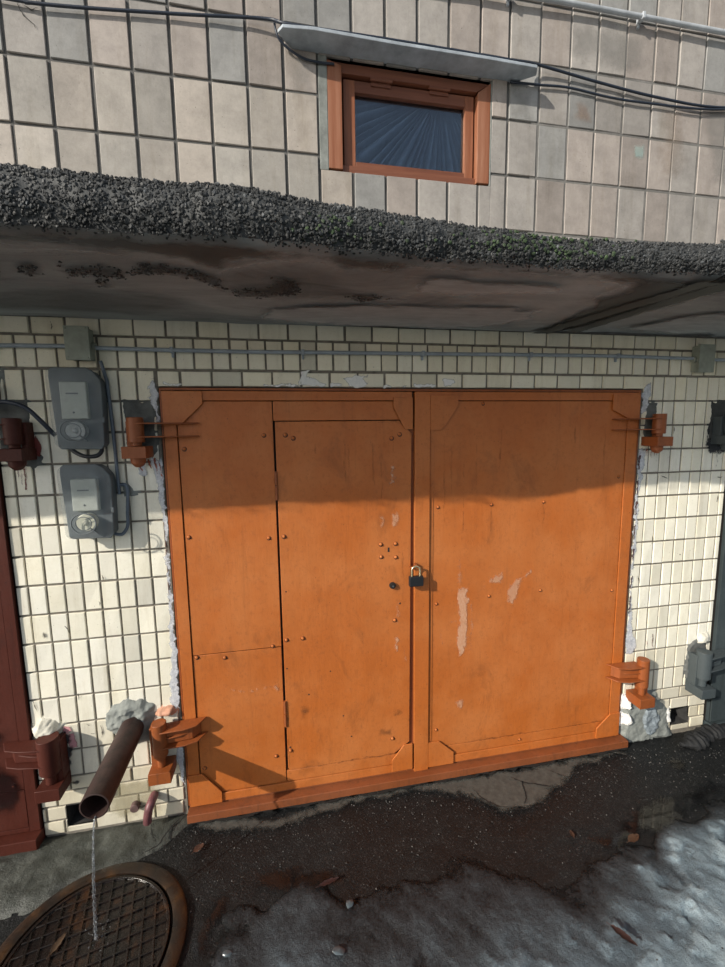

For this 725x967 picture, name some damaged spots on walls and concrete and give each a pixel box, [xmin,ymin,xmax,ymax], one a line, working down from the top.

water stain [0,235,277,274]
water stain [535,278,725,337]
peeling [148,381,181,422]
peeling [264,370,367,388]
peeling [403,378,455,388]
peeling [641,383,651,414]
peeling [138,457,168,541]
peeling [625,449,646,654]
peeling [163,553,180,708]
peeling [176,747,185,784]